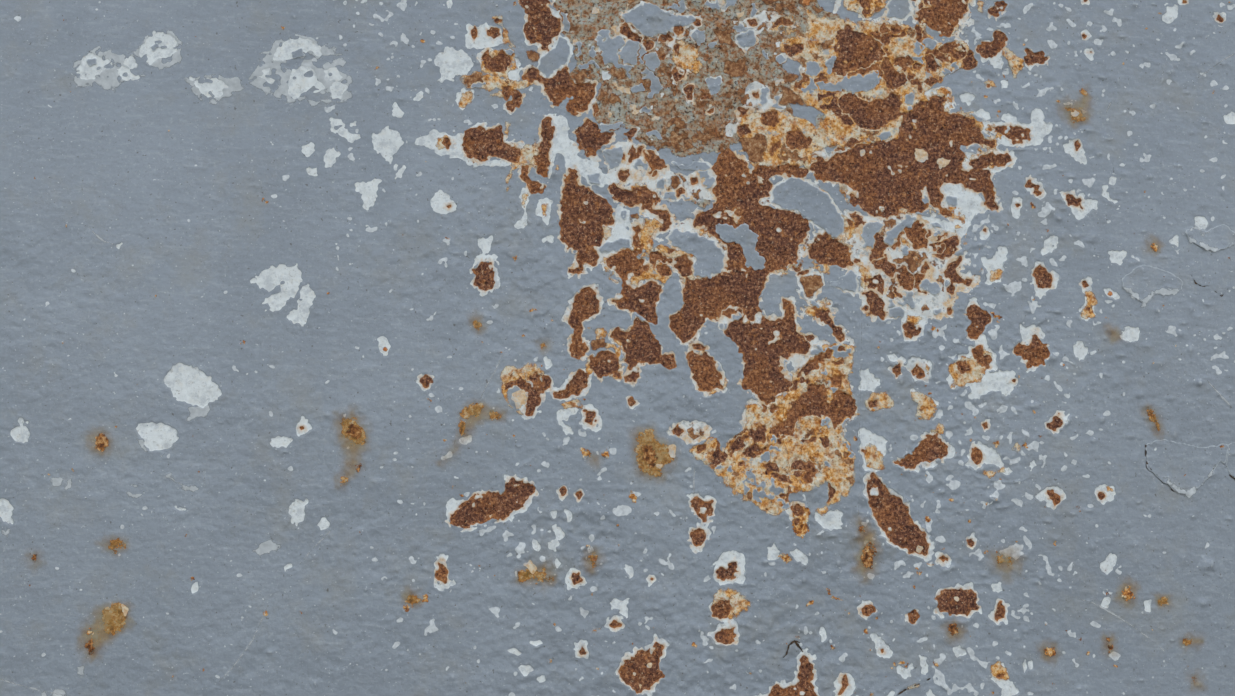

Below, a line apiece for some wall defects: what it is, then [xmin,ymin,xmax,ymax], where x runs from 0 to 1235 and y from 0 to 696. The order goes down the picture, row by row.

peeling [185,34,352,106]
peeling [302,0,1120,568]
peeling [136,363,222,452]
rust [340,414,366,448]
rust [443,403,502,445]
rust [634,429,676,477]
rust [767,506,843,565]
rust [84,602,129,655]
rust [518,560,554,584]
peeling [707,550,750,646]
peeling [904,582,1010,625]
peeling [615,634,670,696]